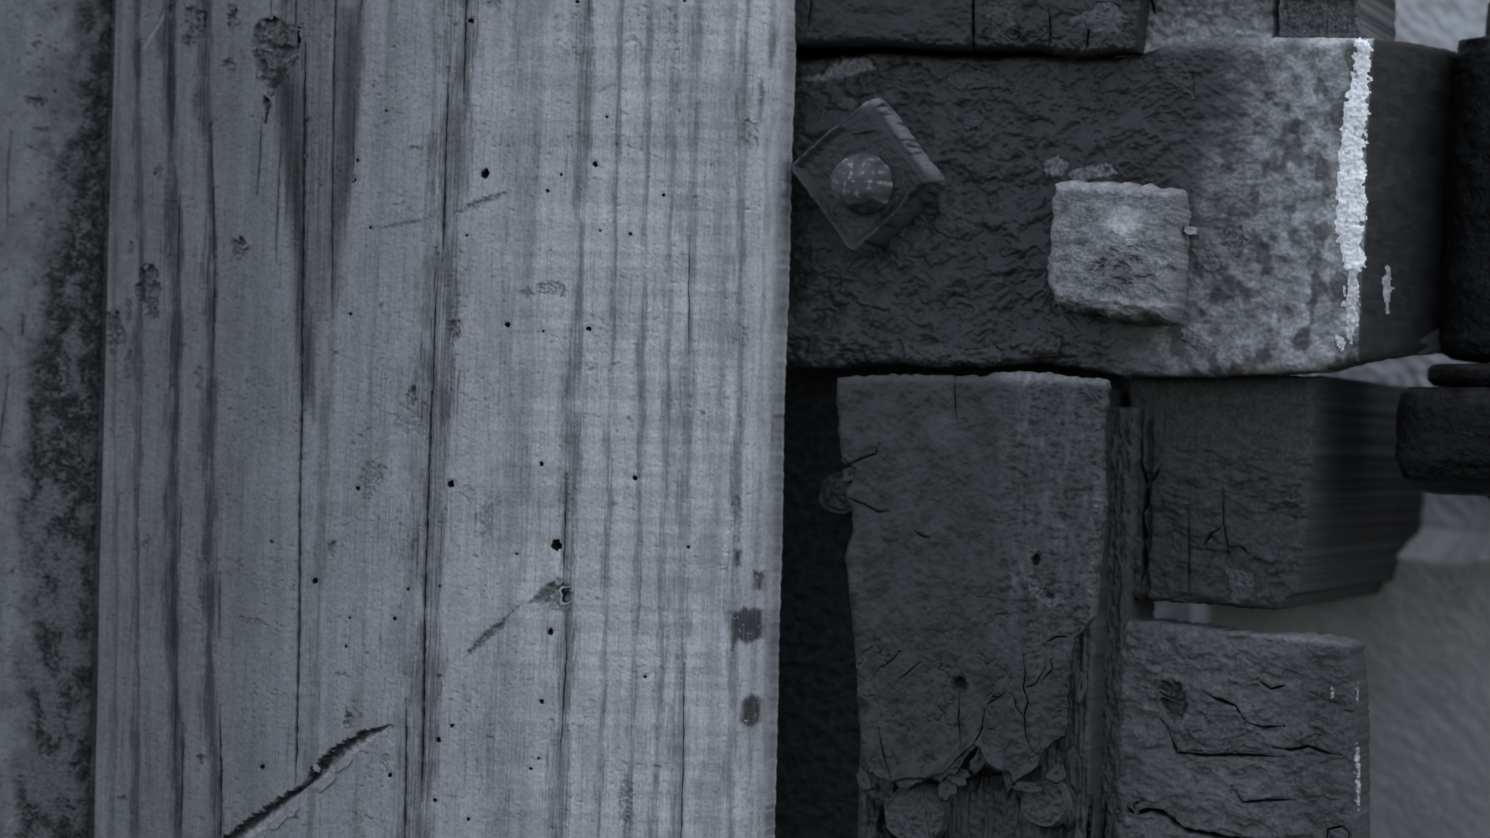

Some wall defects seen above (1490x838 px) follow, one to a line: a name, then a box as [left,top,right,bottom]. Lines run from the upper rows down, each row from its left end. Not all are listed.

peeling [836,327,1111,802]
crack [179,705,224,838]
crack [1083,679,1342,838]
crack [1324,824,1352,838]